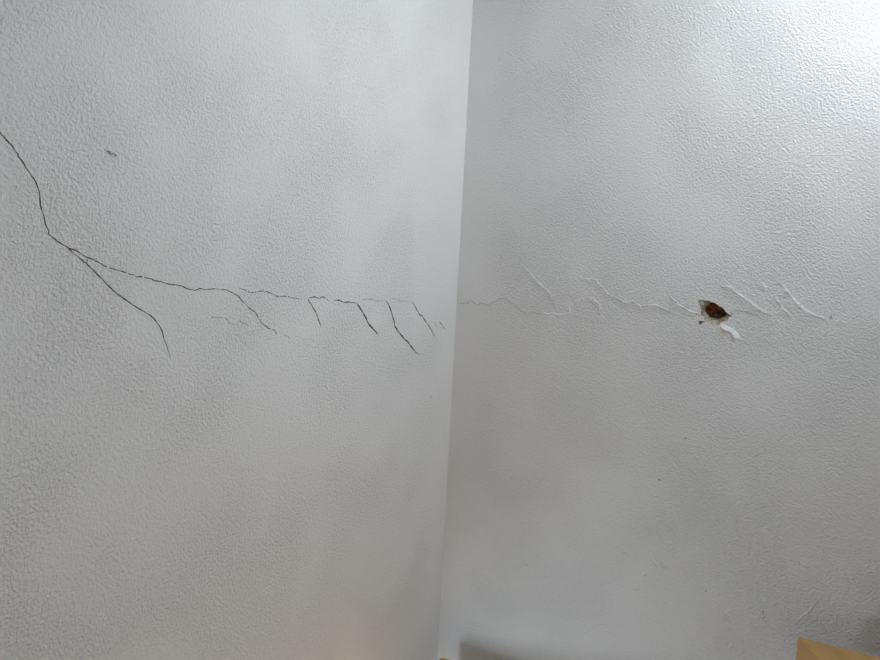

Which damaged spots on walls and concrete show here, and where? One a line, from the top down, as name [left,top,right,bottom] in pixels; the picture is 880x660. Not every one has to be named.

crack [0,132,445,355]
flaking render [698,300,741,342]